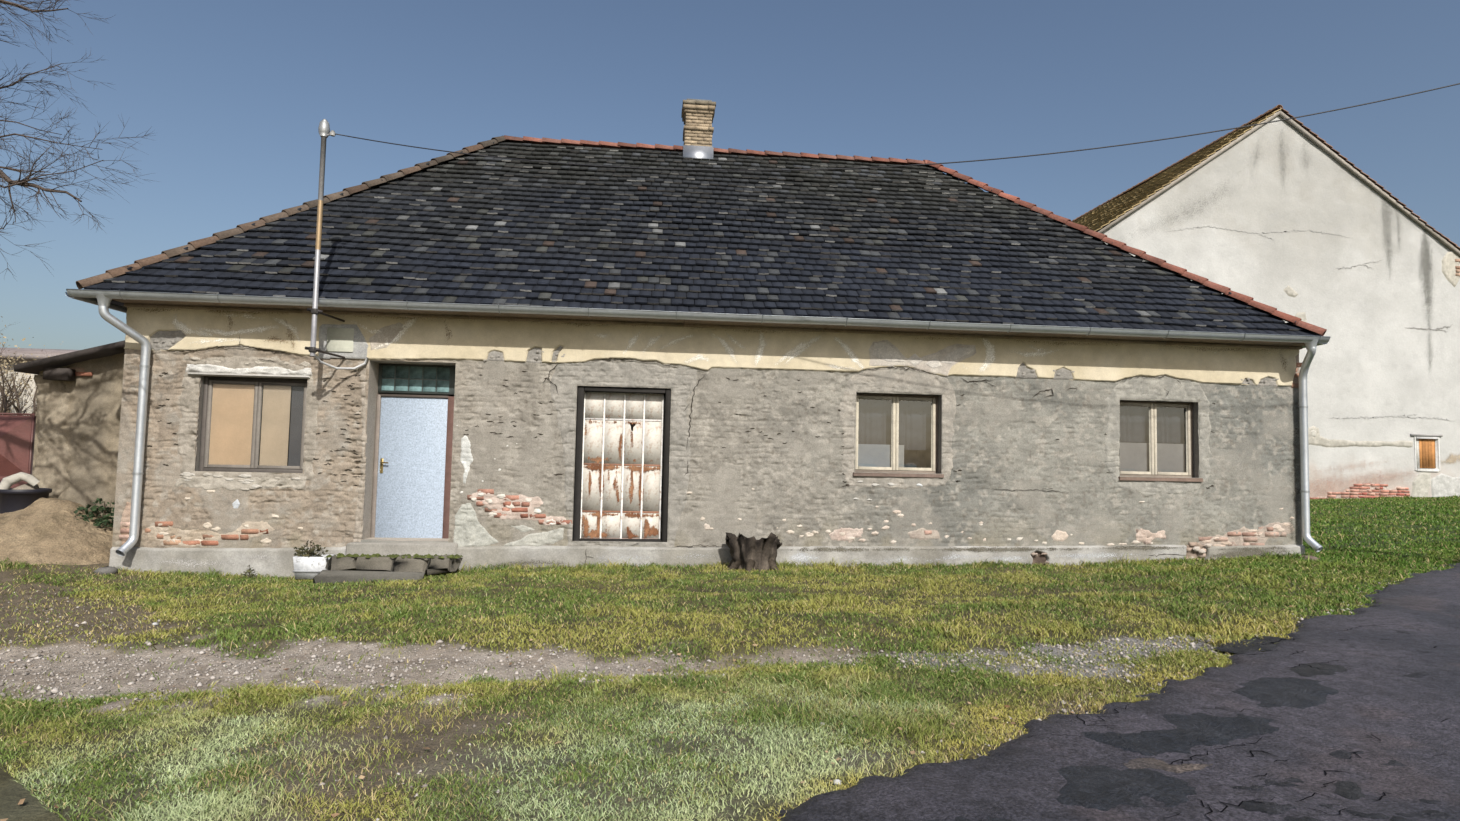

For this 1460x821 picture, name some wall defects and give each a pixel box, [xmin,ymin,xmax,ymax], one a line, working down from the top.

crack [1169,226,1382,269]
water stain [1340,166,1443,369]
spalling [1442,251,1460,287]
spalling [369,322,406,350]
flaking render [185,357,312,376]
spalling [869,340,976,376]
spalling [1308,426,1413,448]
flaking render [119,472,307,548]
flaking render [456,425,572,526]
rust [581,415,660,539]
flaking render [1310,484,1410,499]
flaking render [1186,508,1295,560]